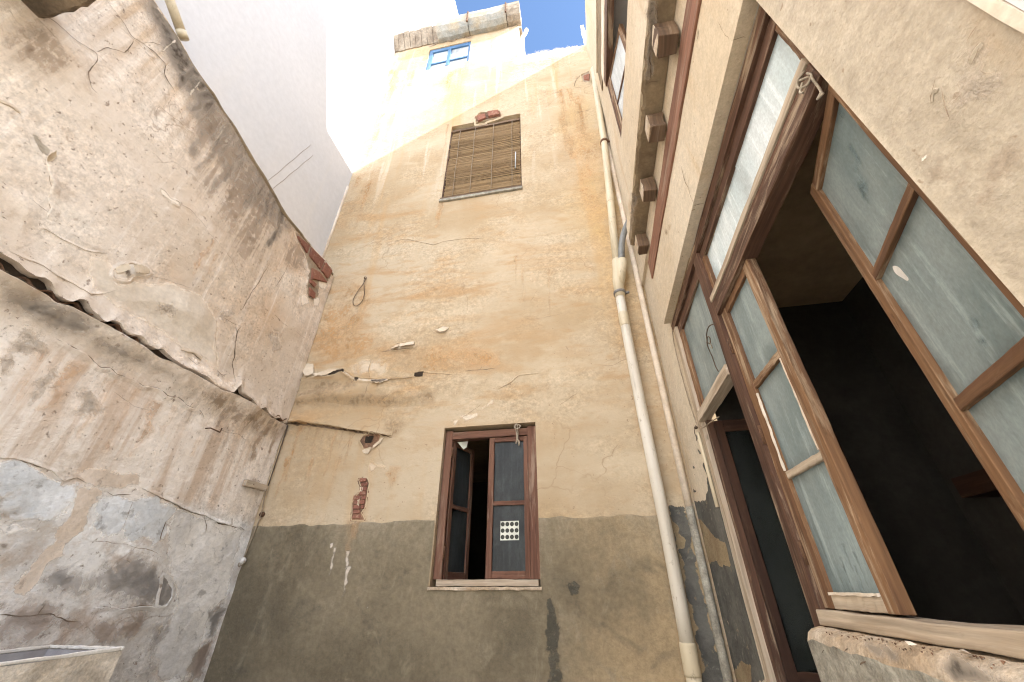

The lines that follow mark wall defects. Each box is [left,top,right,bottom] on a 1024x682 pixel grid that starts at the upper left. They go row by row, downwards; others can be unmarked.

crack [40,2,202,138]
flaking render [473,110,504,126]
flaking render [293,231,333,301]
crack [51,338,244,439]
peeling [299,362,424,394]
flaking render [358,430,384,454]
crack [0,454,247,554]
flaking render [350,476,371,522]
spalling [155,572,175,610]
peeling [669,435,764,682]
leakage [545,598,563,682]